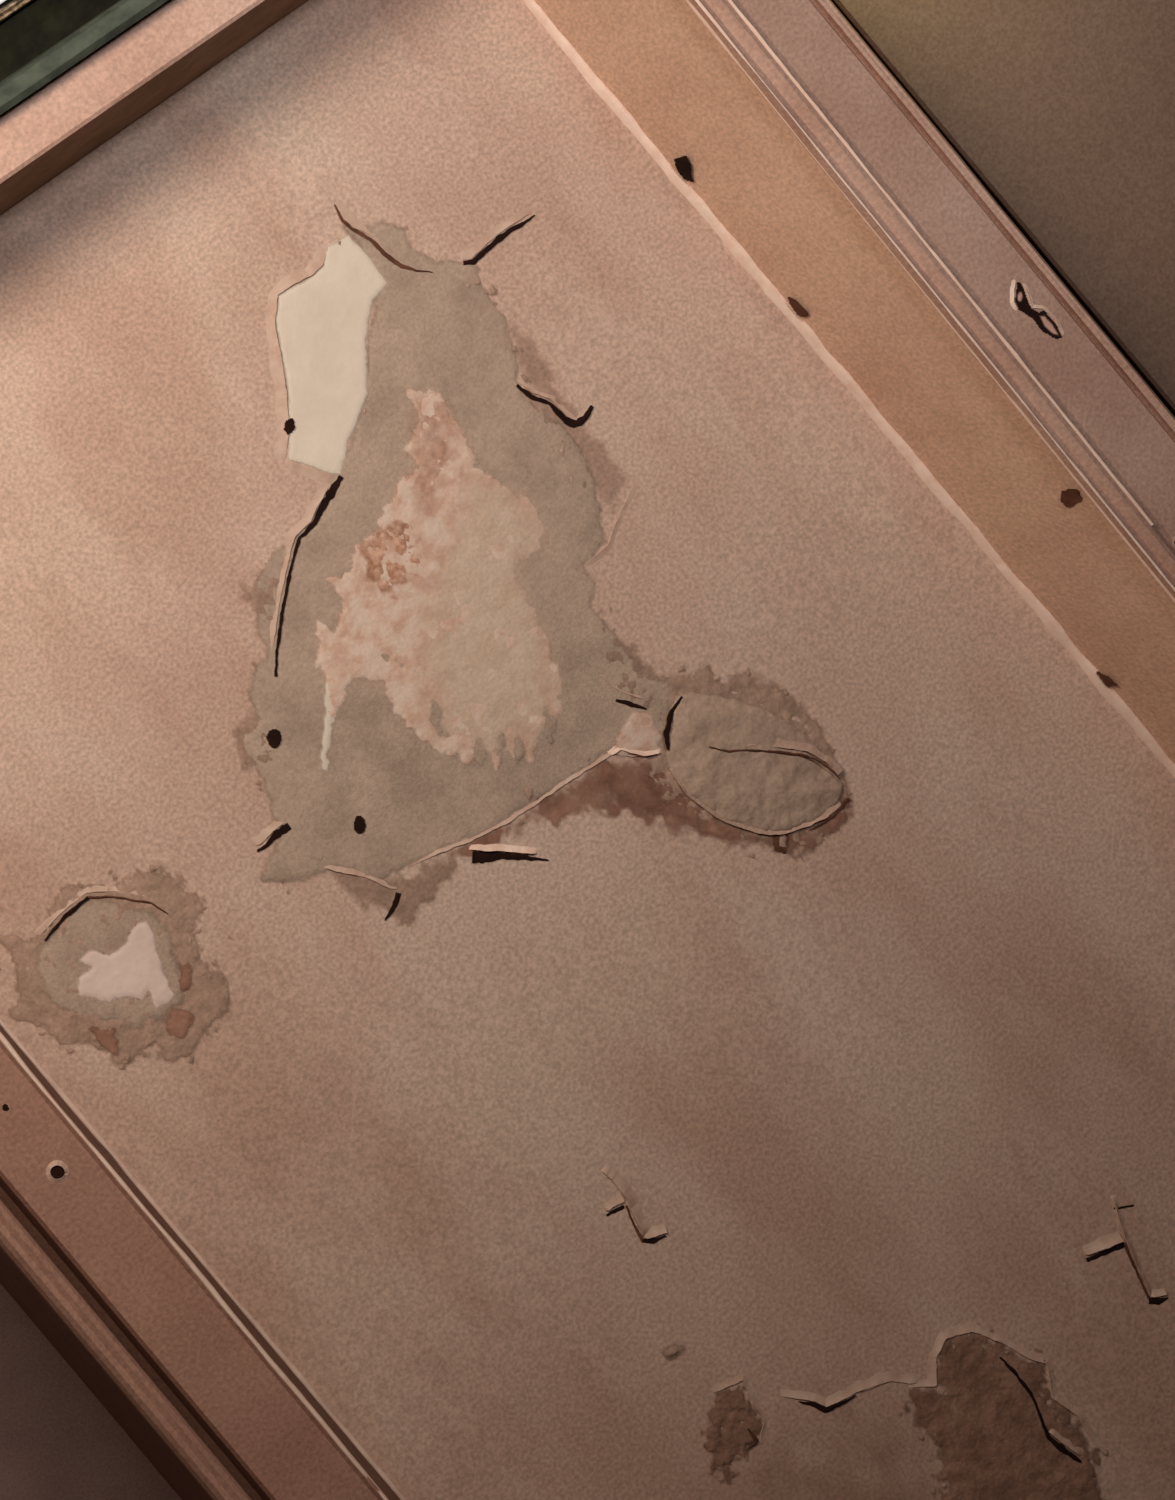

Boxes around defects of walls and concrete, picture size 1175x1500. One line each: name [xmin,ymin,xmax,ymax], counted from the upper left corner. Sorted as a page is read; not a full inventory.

crack [460,207,535,265]
peeling [787,297,809,317]
crack [516,376,593,428]
peeling [234,199,669,923]
peeling [0,865,229,1069]
crack [606,1205,666,1244]
crack [1086,1204,1168,1305]
peeling [701,1375,767,1484]
crack [781,1372,919,1412]
peeling [899,1323,1108,1500]